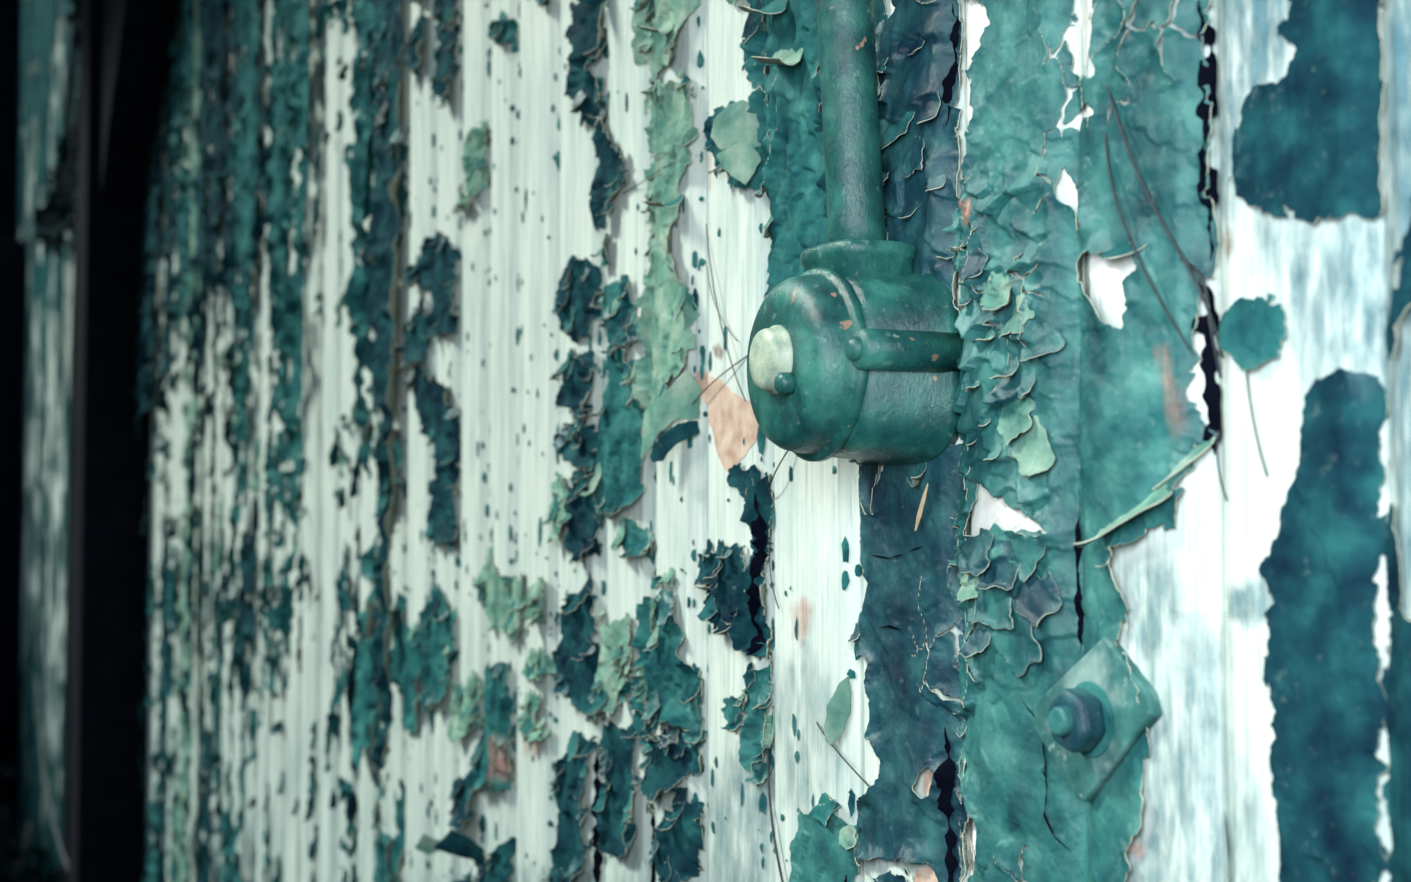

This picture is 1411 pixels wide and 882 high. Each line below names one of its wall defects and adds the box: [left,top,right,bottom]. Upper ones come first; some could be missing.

peeling [1229,0,1387,225]
peeling [133,0,829,882]
peeling [789,0,1220,882]
peeling [1218,293,1287,371]
peeling [1385,221,1411,360]
peeling [1258,367,1411,882]
crack [1021,699,1070,851]